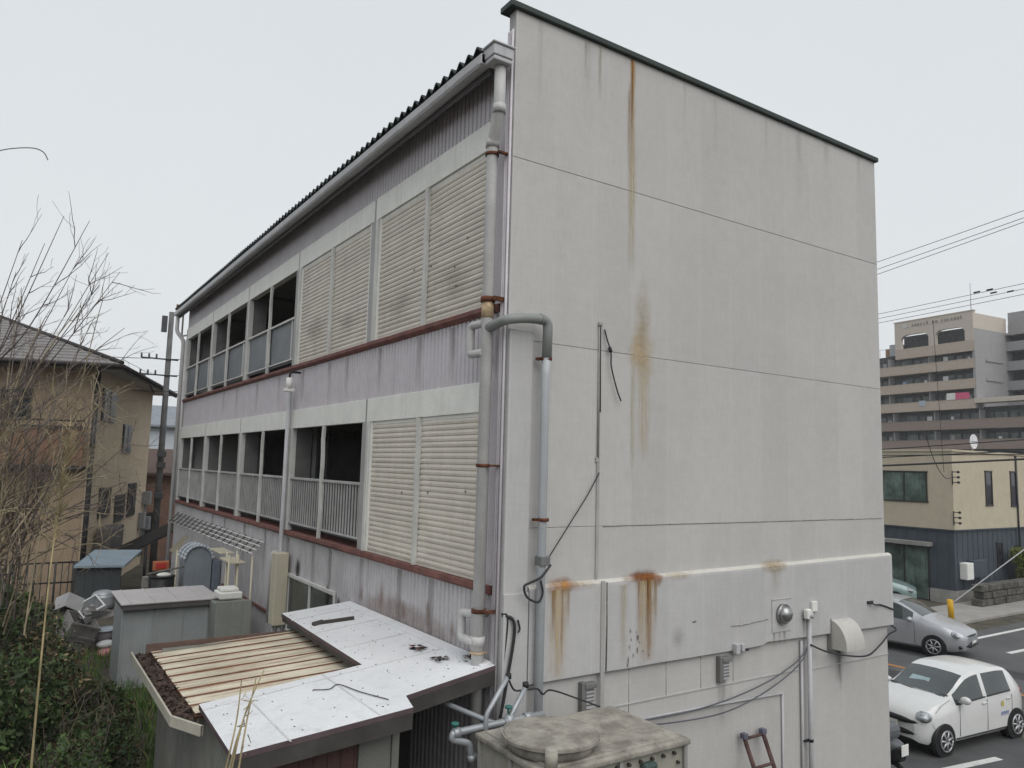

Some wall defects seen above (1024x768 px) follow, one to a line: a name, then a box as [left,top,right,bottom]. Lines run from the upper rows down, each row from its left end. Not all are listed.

corrosion [633,572,661,628]